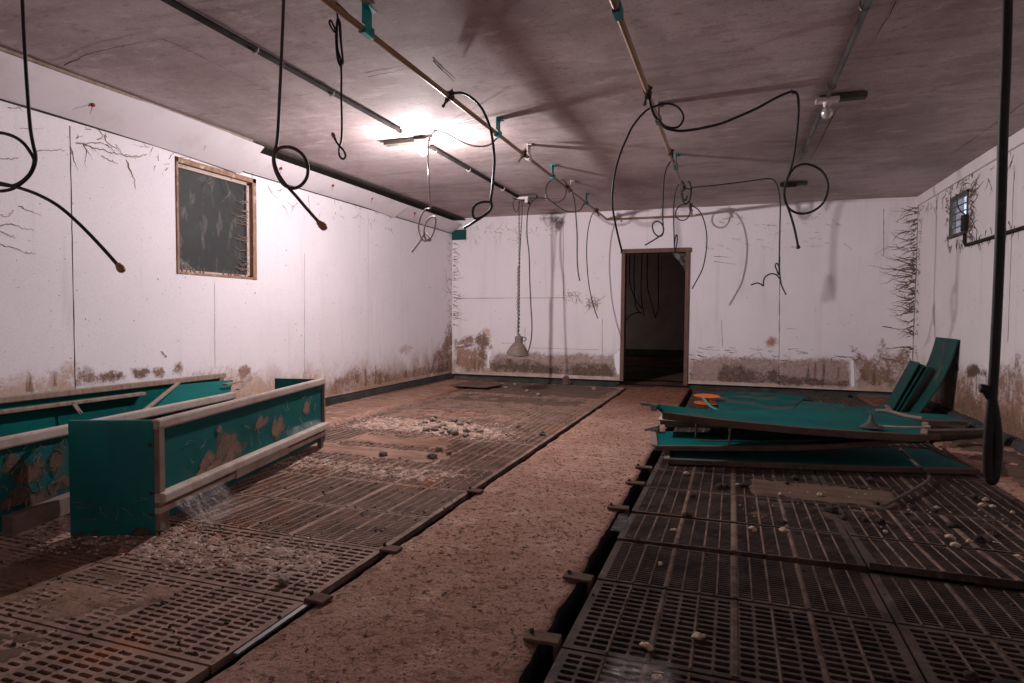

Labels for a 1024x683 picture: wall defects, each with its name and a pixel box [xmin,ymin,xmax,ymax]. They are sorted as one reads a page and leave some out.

leakage [0,370,73,396]
leakage [333,325,452,394]
leakage [853,345,910,386]
leakage [953,355,1024,440]